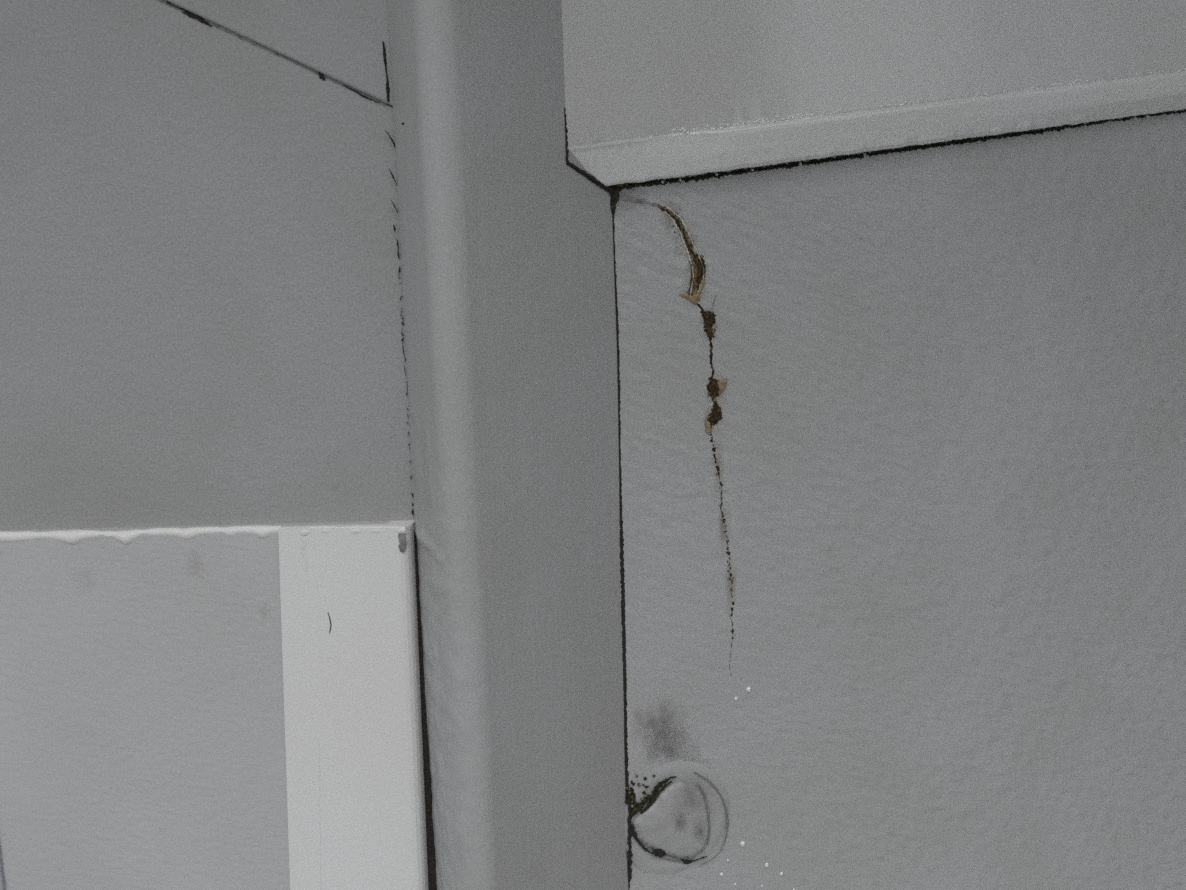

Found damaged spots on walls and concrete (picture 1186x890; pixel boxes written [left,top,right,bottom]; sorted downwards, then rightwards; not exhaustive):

crack [612,109,1186,890]